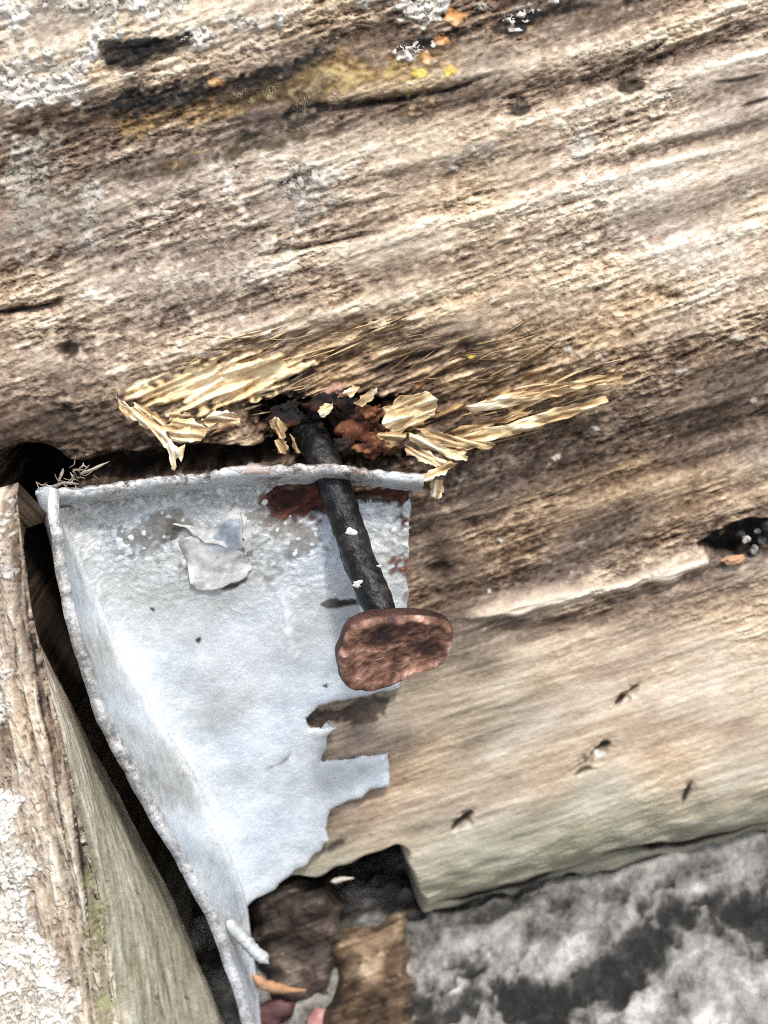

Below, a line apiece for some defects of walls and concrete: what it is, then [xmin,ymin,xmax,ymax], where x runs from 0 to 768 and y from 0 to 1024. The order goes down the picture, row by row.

corrosion [309,382,353,400]
peeling [317,403,333,418]
peeling [115,396,242,471]
peeling [269,417,301,454]
peeling [342,373,623,500]
corrosion [245,464,269,475]
corrosion [259,483,326,521]
corrosion [351,469,411,525]
corrosion [389,556,410,573]